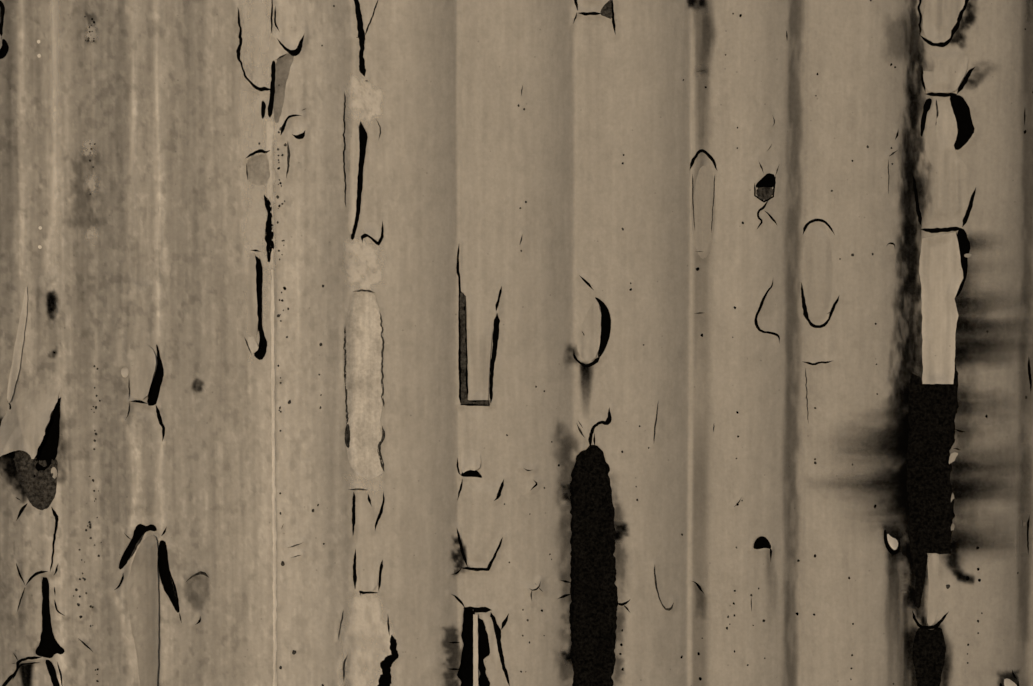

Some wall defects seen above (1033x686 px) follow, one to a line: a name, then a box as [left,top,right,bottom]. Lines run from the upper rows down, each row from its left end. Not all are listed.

peeling [917,0,982,180]
peeling [0,287,65,686]
peeling [121,345,165,441]
peeling [244,53,294,360]
spalling [338,76,399,686]
peeling [457,449,482,500]
peeling [456,246,502,406]
peeling [473,614,501,686]
peeling [567,275,611,388]
rust [558,407,630,686]
rust [857,296,997,686]
peeling [912,174,976,384]